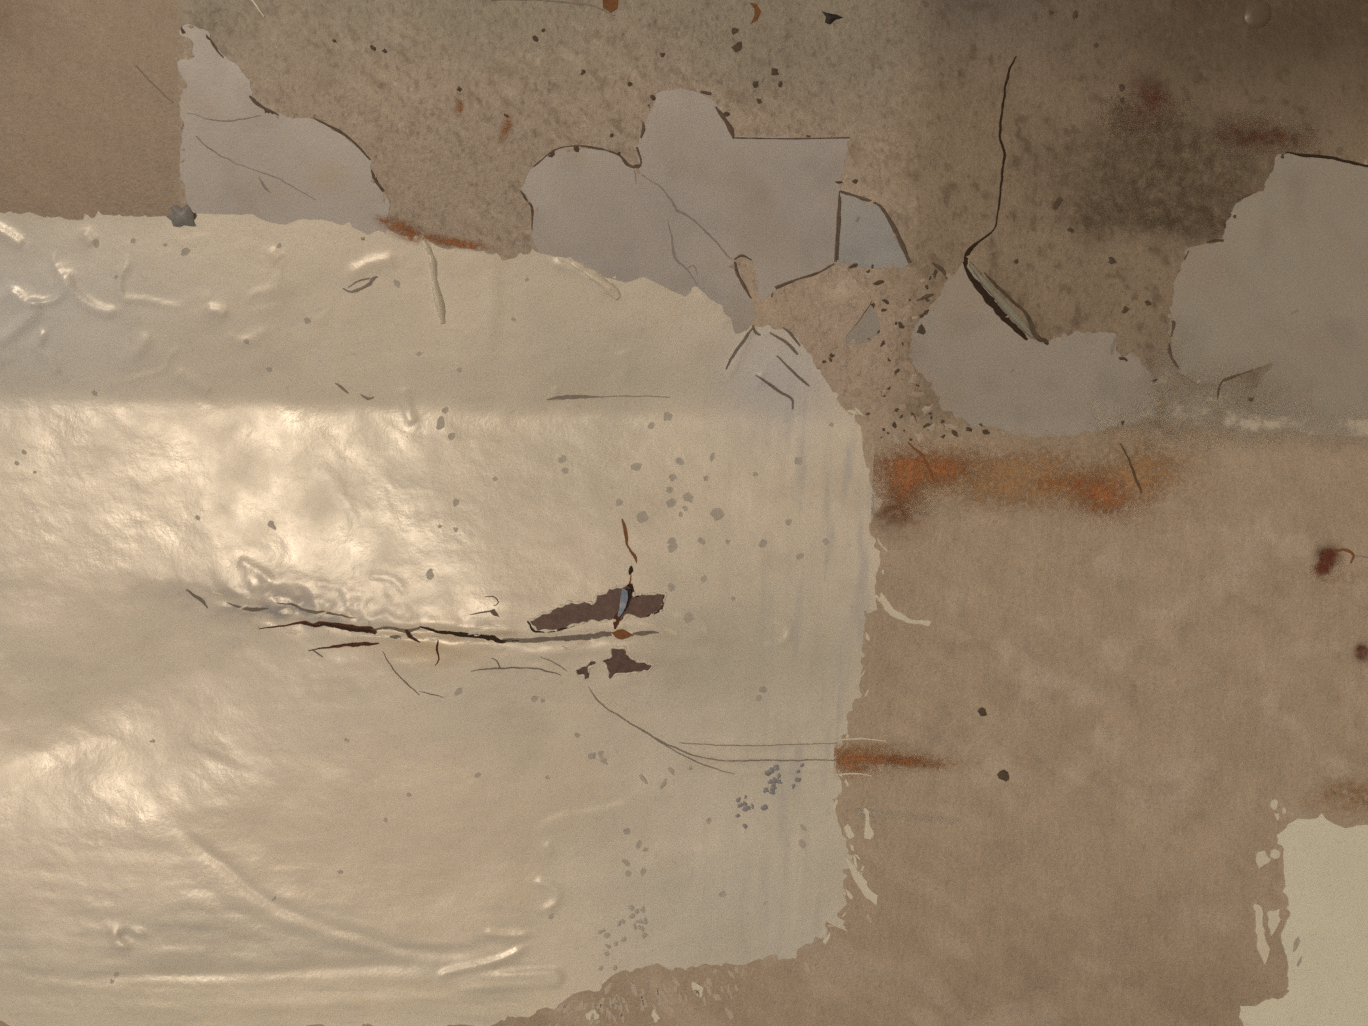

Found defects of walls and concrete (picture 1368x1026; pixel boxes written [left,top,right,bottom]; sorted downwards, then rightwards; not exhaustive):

peeling [175,24,390,240]
rust [379,218,479,249]
peeling [520,88,1161,444]
crack [963,56,1049,344]
peeling [1167,153,1368,437]
rust [878,442,1174,522]
crack [621,519,637,584]
rust [1315,548,1355,574]
crack [186,589,679,698]
rust [834,738,940,776]